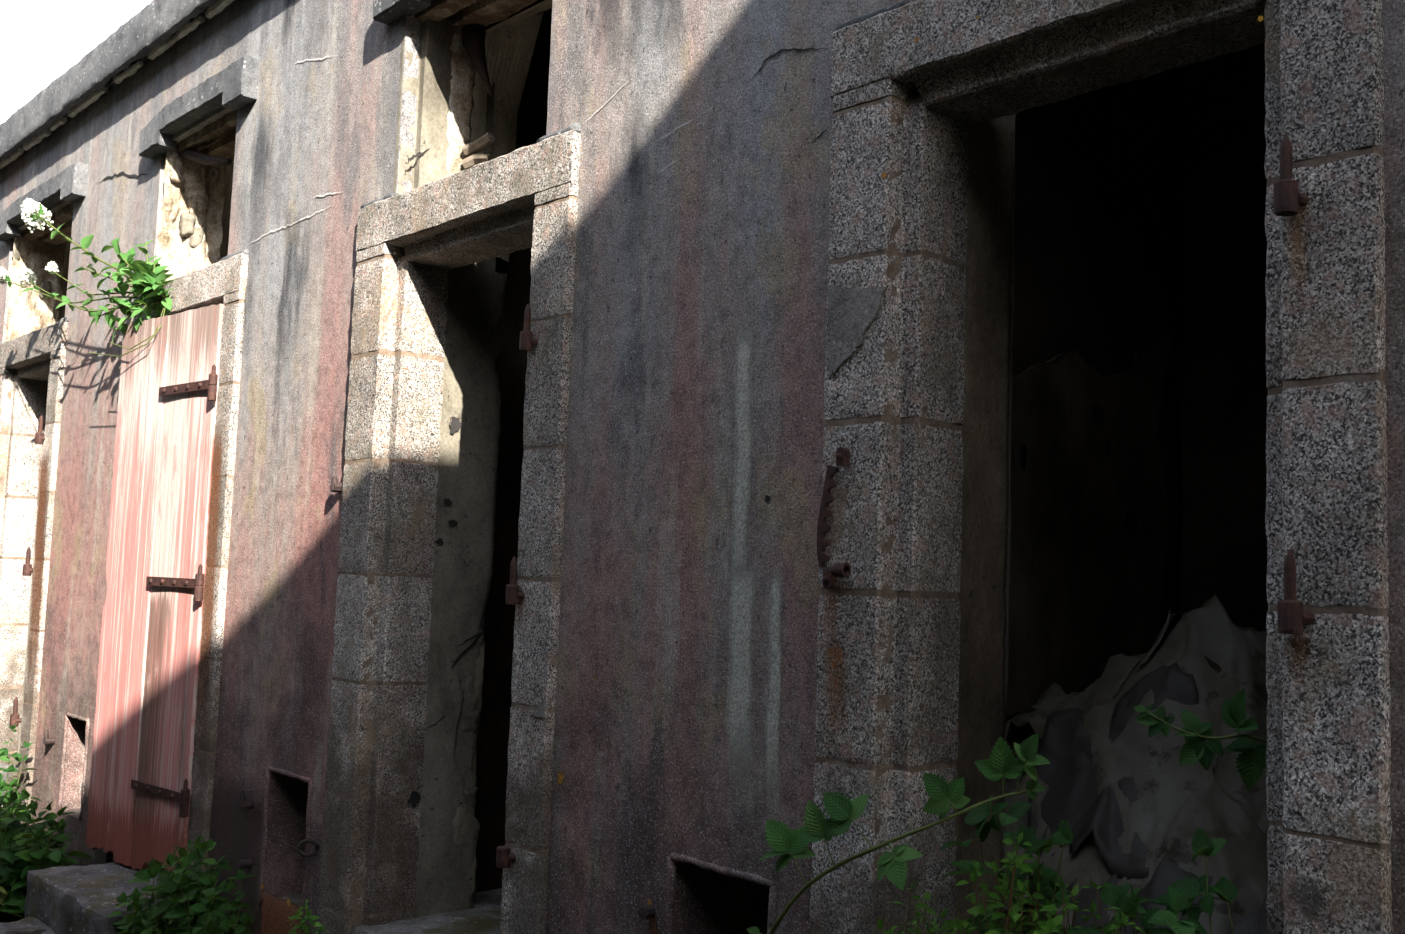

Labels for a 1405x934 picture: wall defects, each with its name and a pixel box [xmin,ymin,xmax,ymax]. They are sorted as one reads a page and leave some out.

crack [751,47,828,80]
crack [99,171,148,183]
water stain [630,130,642,195]